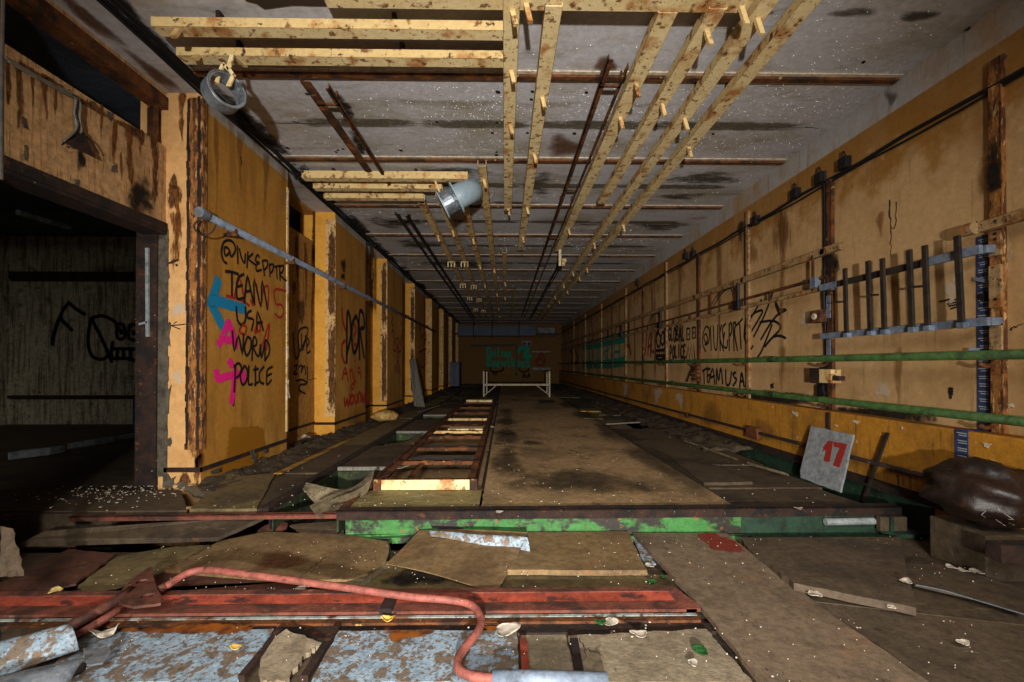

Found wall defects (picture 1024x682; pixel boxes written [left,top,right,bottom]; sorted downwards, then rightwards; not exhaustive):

corrosion [64,0,115,38]
damp [903,12,937,21]
corrosion [5,60,71,128]
corrosion [132,55,186,139]
corrosion [81,98,182,266]
damp [488,173,605,194]
damp [639,173,733,199]
peeling [163,96,202,458]
spalling [162,474,190,490]